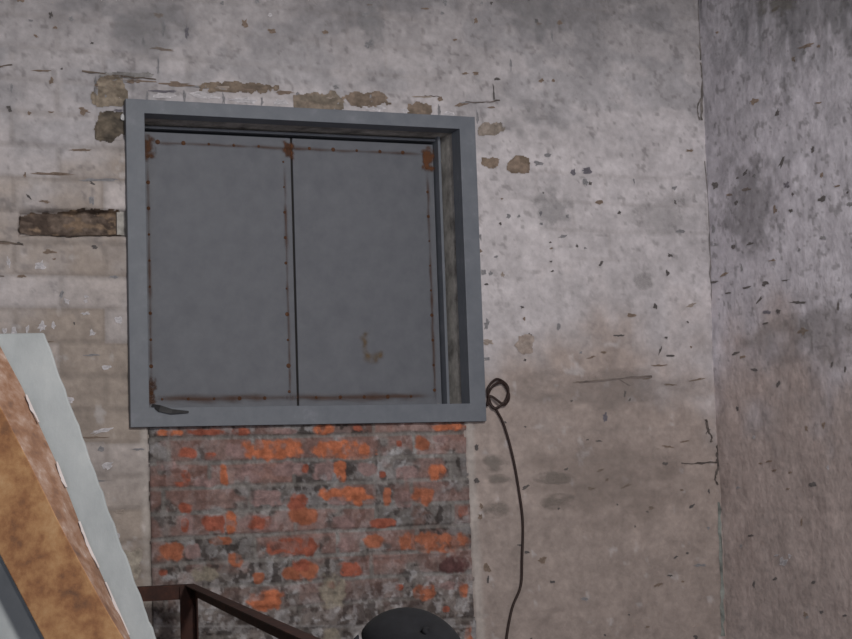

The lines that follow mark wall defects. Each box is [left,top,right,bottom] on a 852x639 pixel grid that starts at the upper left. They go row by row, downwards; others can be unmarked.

spalling [79,37,391,143]
spalling [481,153,551,174]
spalling [17,194,124,249]
flaking render [124,422,484,639]
crack [681,419,725,636]